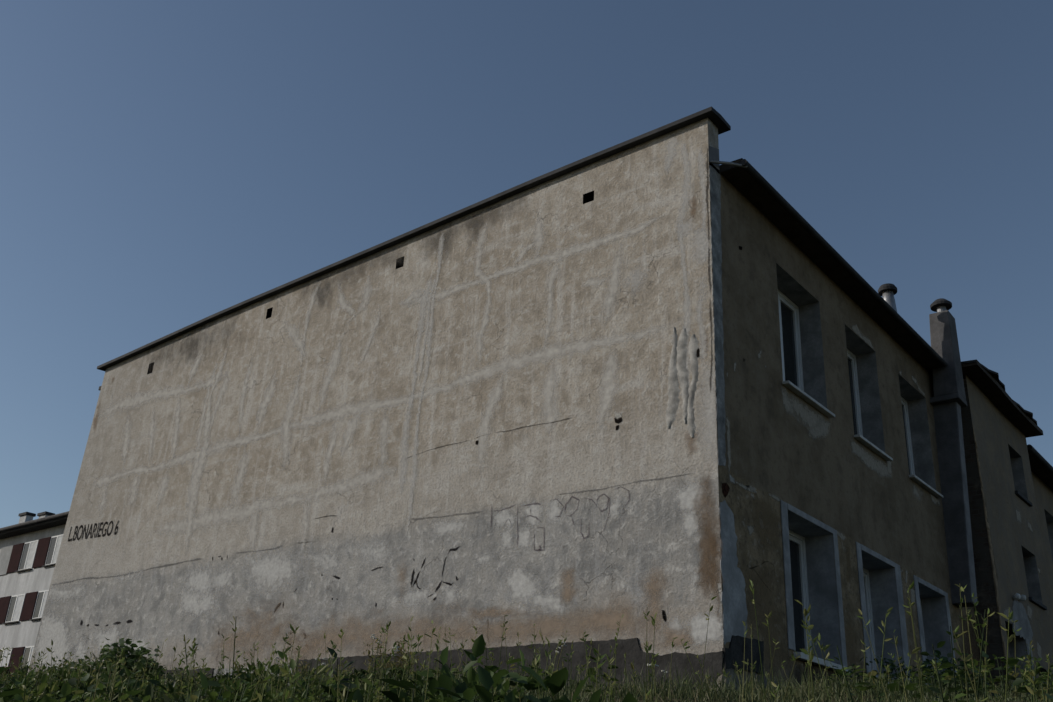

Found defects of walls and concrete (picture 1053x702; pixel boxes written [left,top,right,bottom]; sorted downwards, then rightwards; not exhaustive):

peeling [782,389,829,438]
peeling [851,442,892,477]
peeling [677,484,708,538]